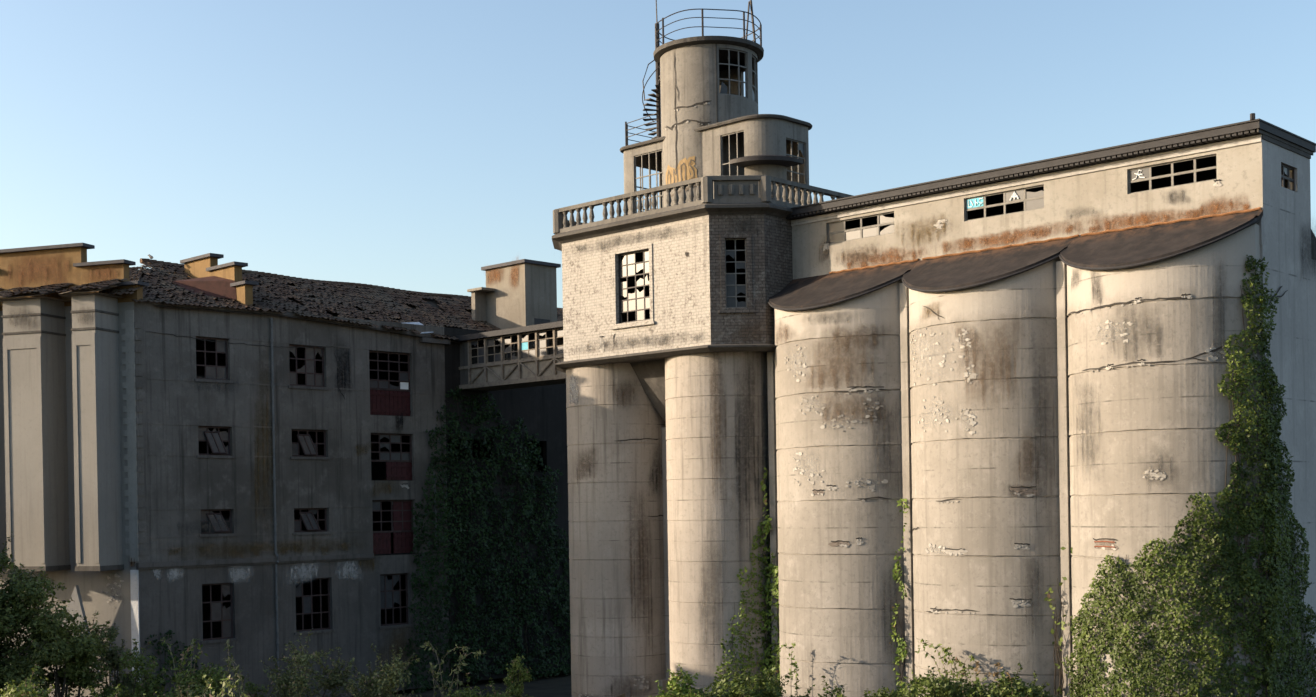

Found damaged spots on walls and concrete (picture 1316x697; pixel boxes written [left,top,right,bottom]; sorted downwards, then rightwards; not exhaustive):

crack [665,52,712,170]
rust [1089,201,1249,232]
rust [943,227,1051,251]
rust [847,249,915,269]
crack [1082,345,1225,372]
peeling [910,328,978,435]
peeling [793,452,888,496]
spalling [1093,538,1118,550]